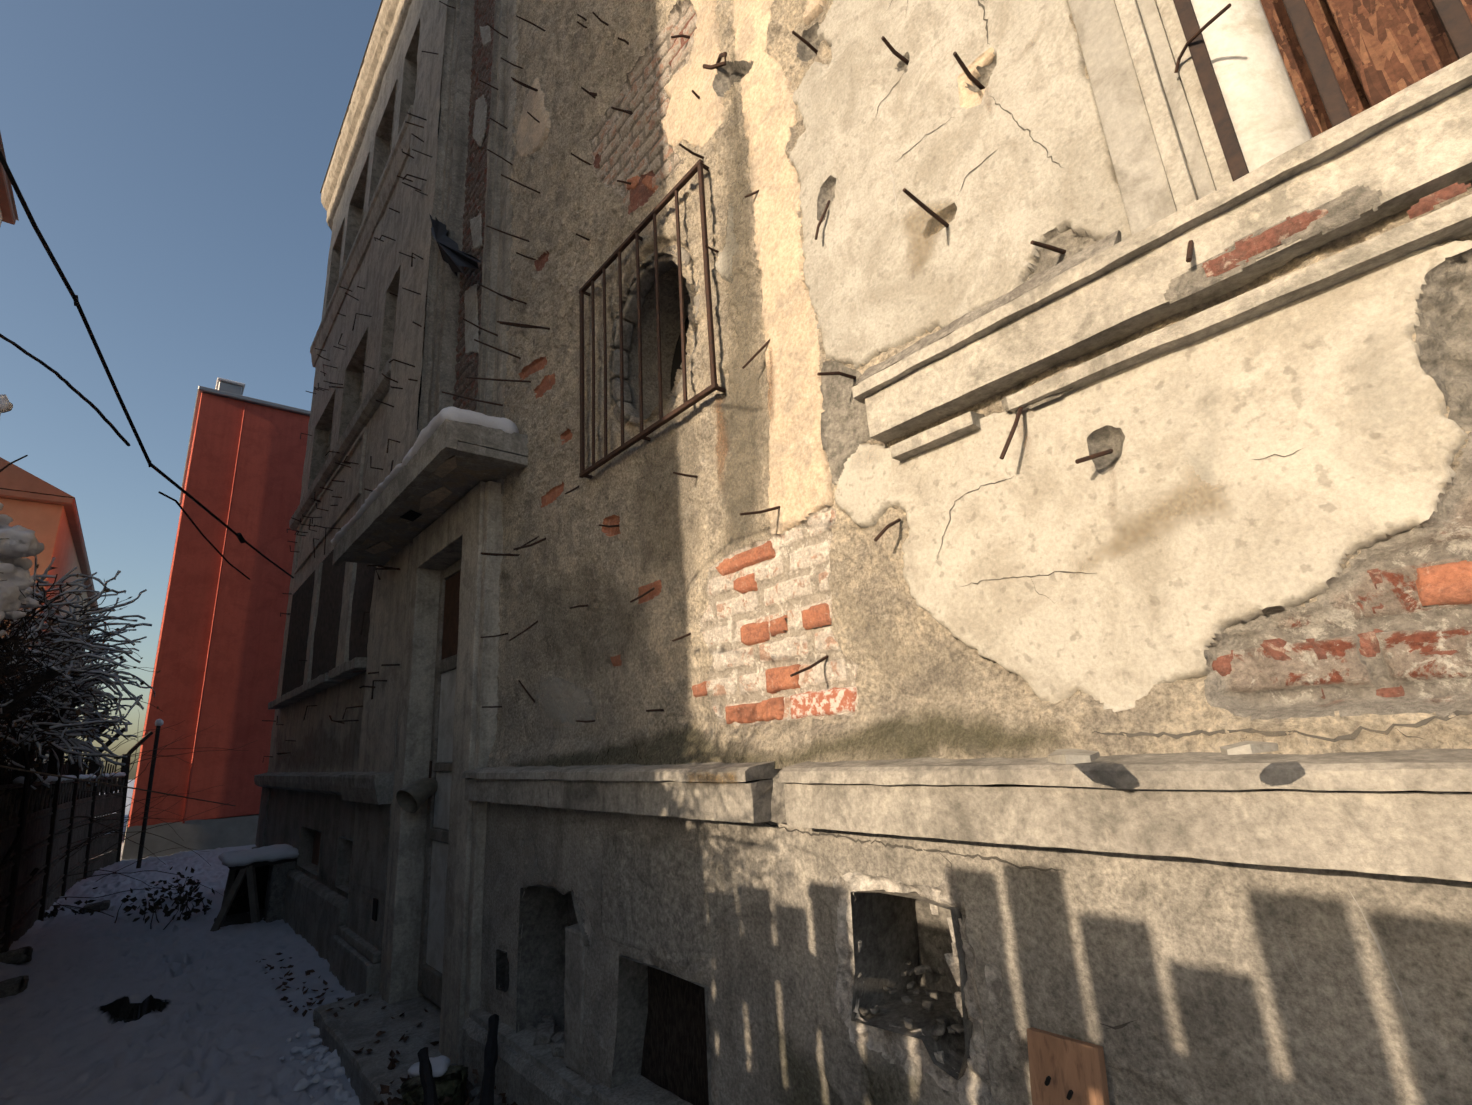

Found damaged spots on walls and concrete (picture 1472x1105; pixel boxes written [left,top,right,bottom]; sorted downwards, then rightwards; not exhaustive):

crack [978,0,989,44]
peeling [589,0,872,726]
crack [957,96,1064,196]
spalling [1164,185,1383,304]
spalling [1204,248,1472,721]
spalling [833,868,1003,1105]